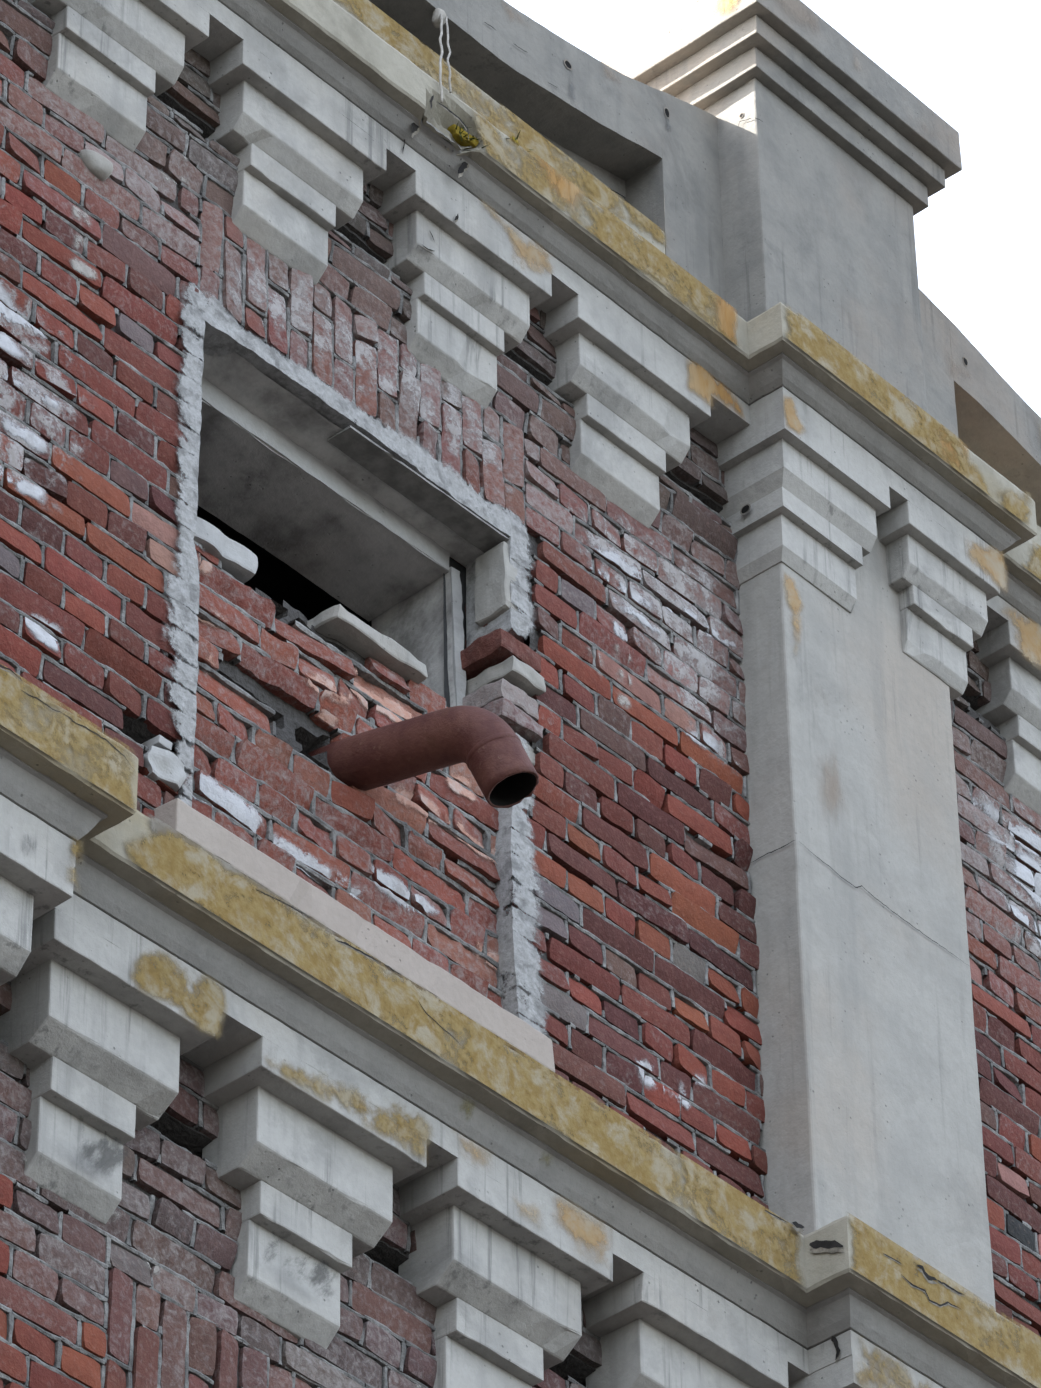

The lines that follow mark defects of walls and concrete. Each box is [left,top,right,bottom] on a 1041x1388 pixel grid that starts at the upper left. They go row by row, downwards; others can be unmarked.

crack [809,1240,843,1253]
crack [883,1253,965,1310]